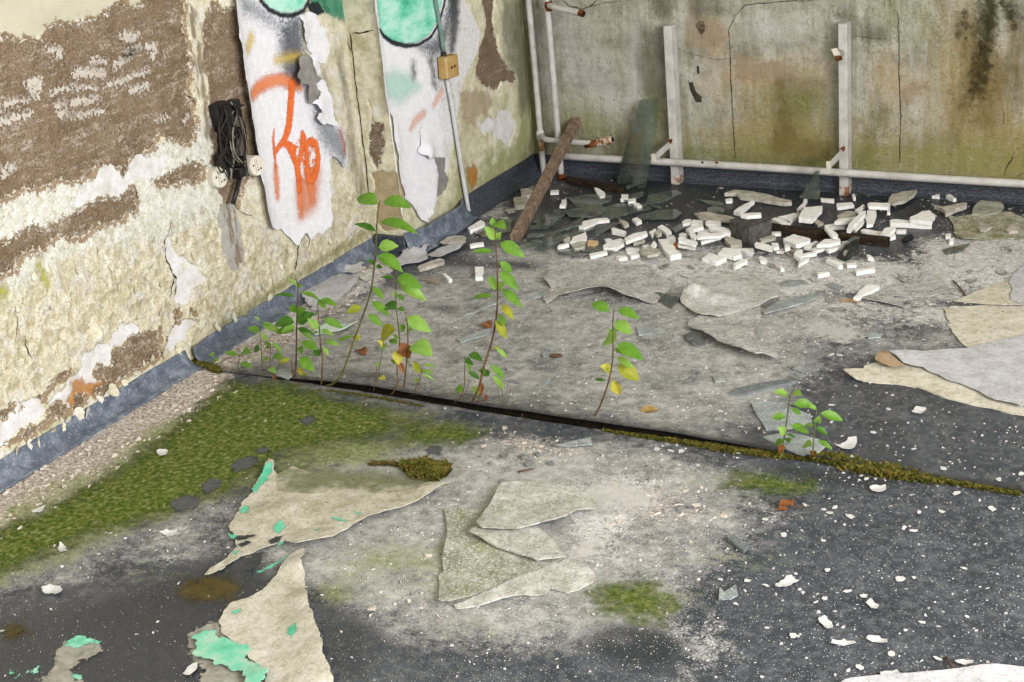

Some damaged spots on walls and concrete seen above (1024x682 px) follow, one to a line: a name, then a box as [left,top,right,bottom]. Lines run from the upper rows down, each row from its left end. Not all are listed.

flaking render [0,0,348,275]
flaking render [476,0,516,91]
crack [678,0,812,158]
crack [854,0,902,164]
water stain [956,0,1023,94]
flaking render [0,219,211,455]